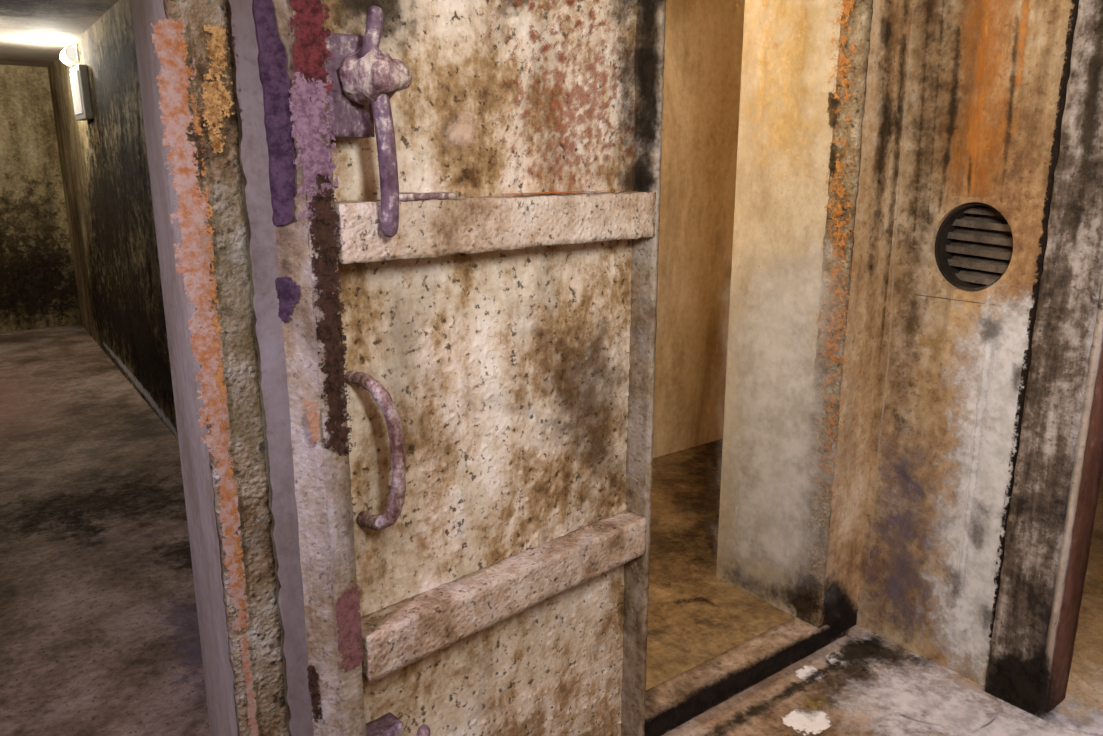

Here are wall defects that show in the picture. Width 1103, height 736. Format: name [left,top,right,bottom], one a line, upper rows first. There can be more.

leakage [0,16,178,439]
rust [190,90,229,442]
rust [488,0,638,195]
rust [813,0,858,499]
leakage [874,17,935,262]
leakage [922,0,949,41]
leakage [1073,0,1103,242]
leakage [0,470,187,544]
leakage [155,541,192,569]
rust [227,456,247,651]
leakage [644,265,920,736]
leakage [868,296,1055,720]